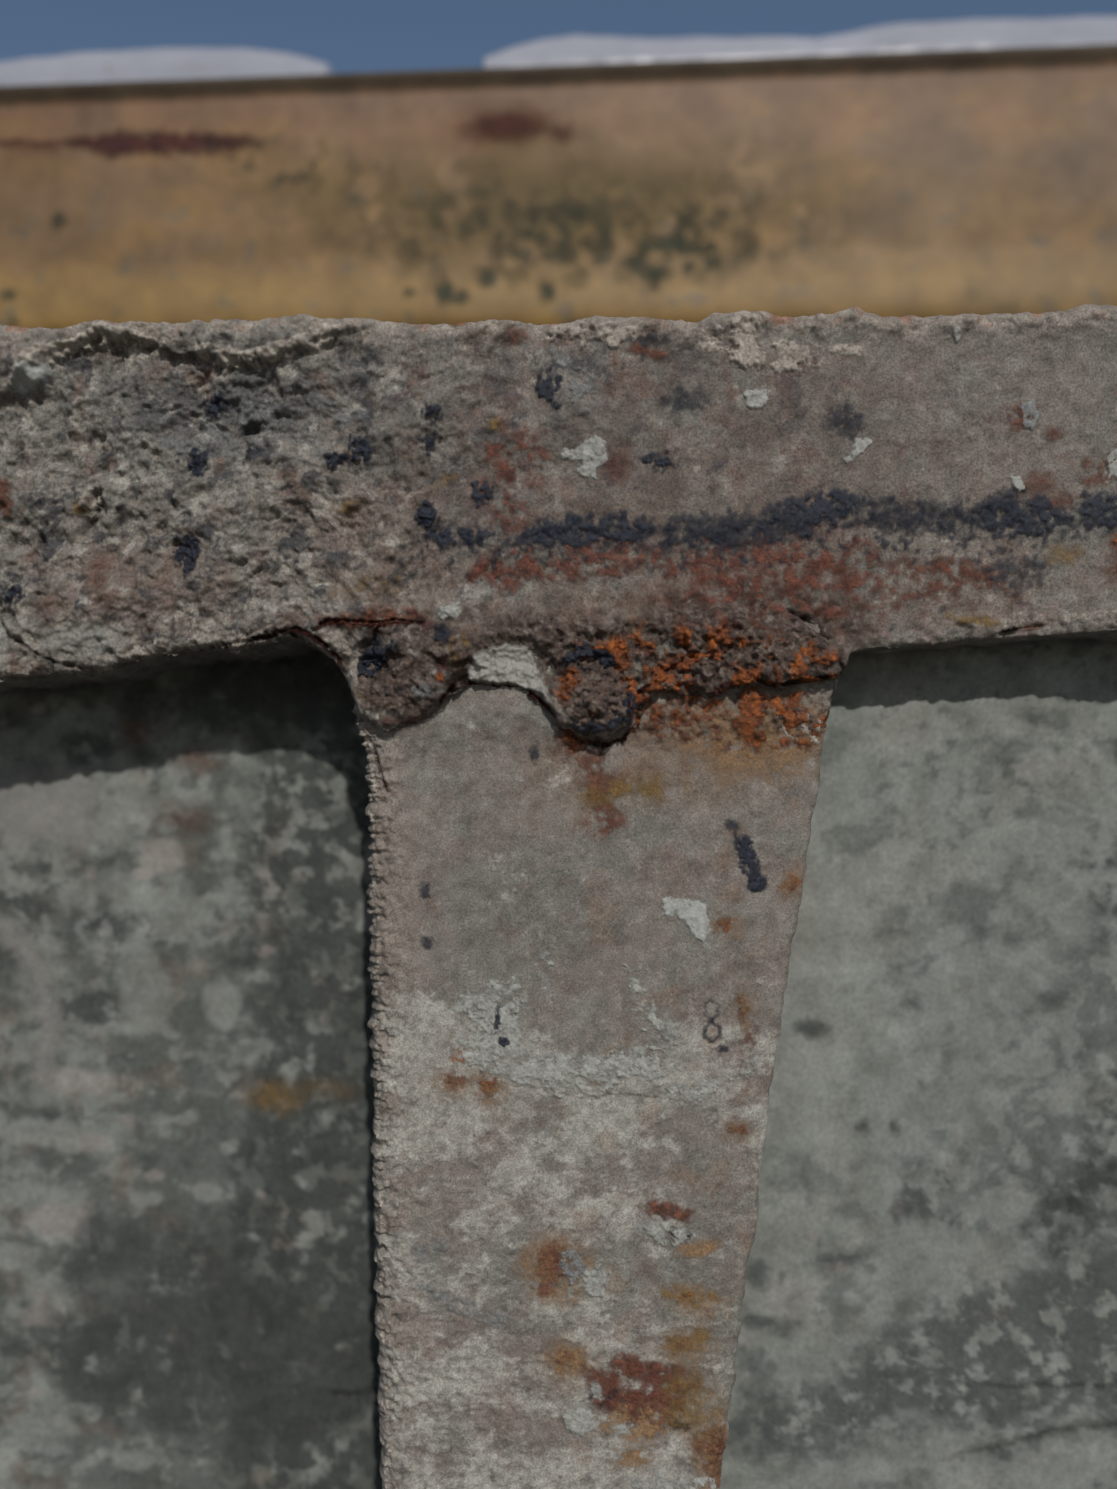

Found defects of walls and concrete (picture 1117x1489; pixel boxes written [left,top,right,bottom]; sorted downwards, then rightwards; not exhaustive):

crack [173,609,420,791]
rust [324,419,1008,834]
water stain [725,820,767,892]
water stain [0,893,124,1084]
water stain [51,650,382,1489]
water stain [703,1003,729,1052]
rust [523,1237,588,1300]
rust [639,1200,716,1256]
water stain [739,1145,1117,1454]
rust [555,1328,727,1489]